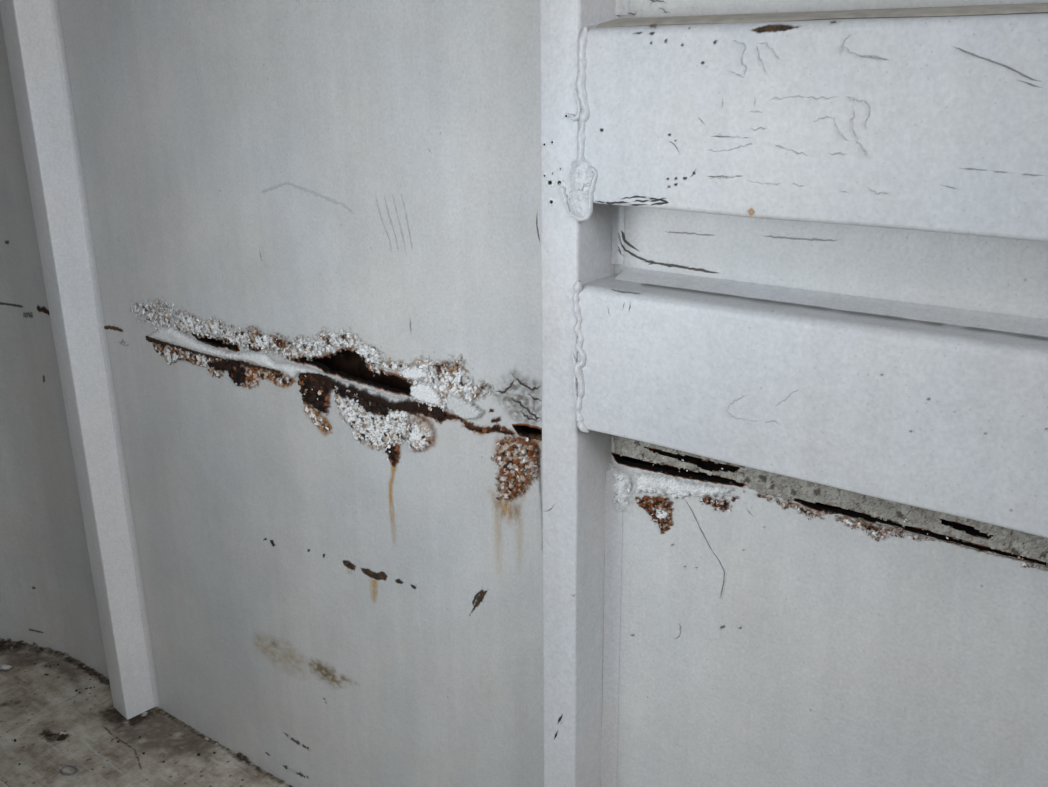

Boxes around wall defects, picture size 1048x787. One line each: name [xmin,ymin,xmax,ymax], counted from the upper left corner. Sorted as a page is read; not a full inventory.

corrosion [146,336,445,434]
peeling [130,300,493,451]
corrosion [384,445,400,504]
corrosion [491,434,540,517]
spalling [521,426,542,436]
crack [686,500,727,599]